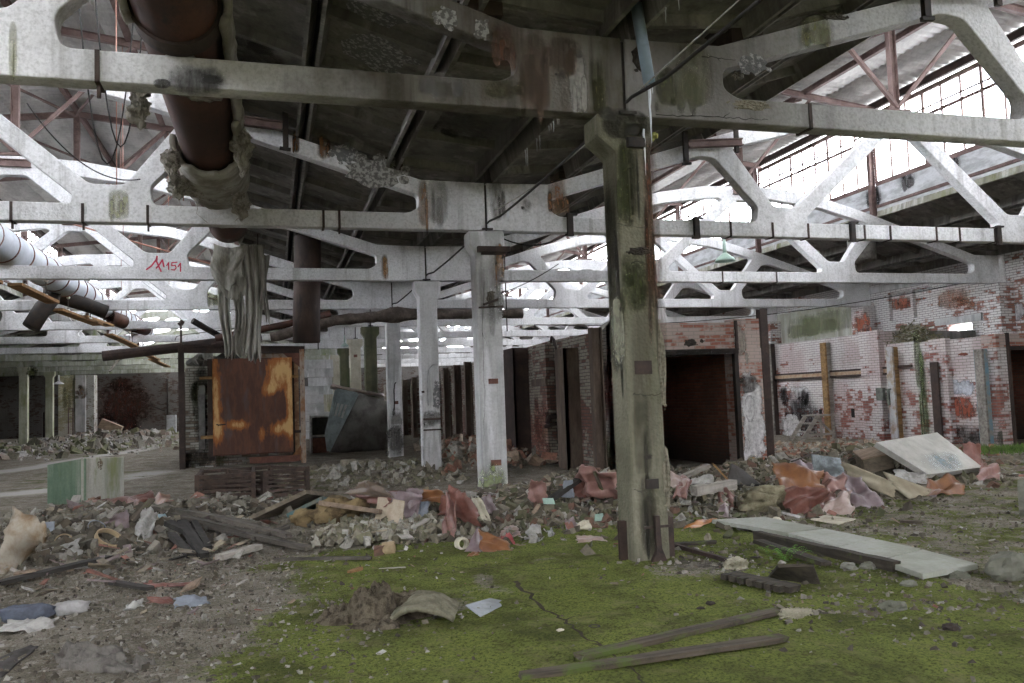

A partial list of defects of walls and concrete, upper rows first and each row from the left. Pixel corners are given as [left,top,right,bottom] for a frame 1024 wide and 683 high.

damp [155,68,223,94]
peeling [328,142,410,188]
corrosion [419,181,428,233]
corrosion [548,181,569,213]
damp [605,151,640,395]
flaking render [954,397,978,418]
crack [513,581,645,683]